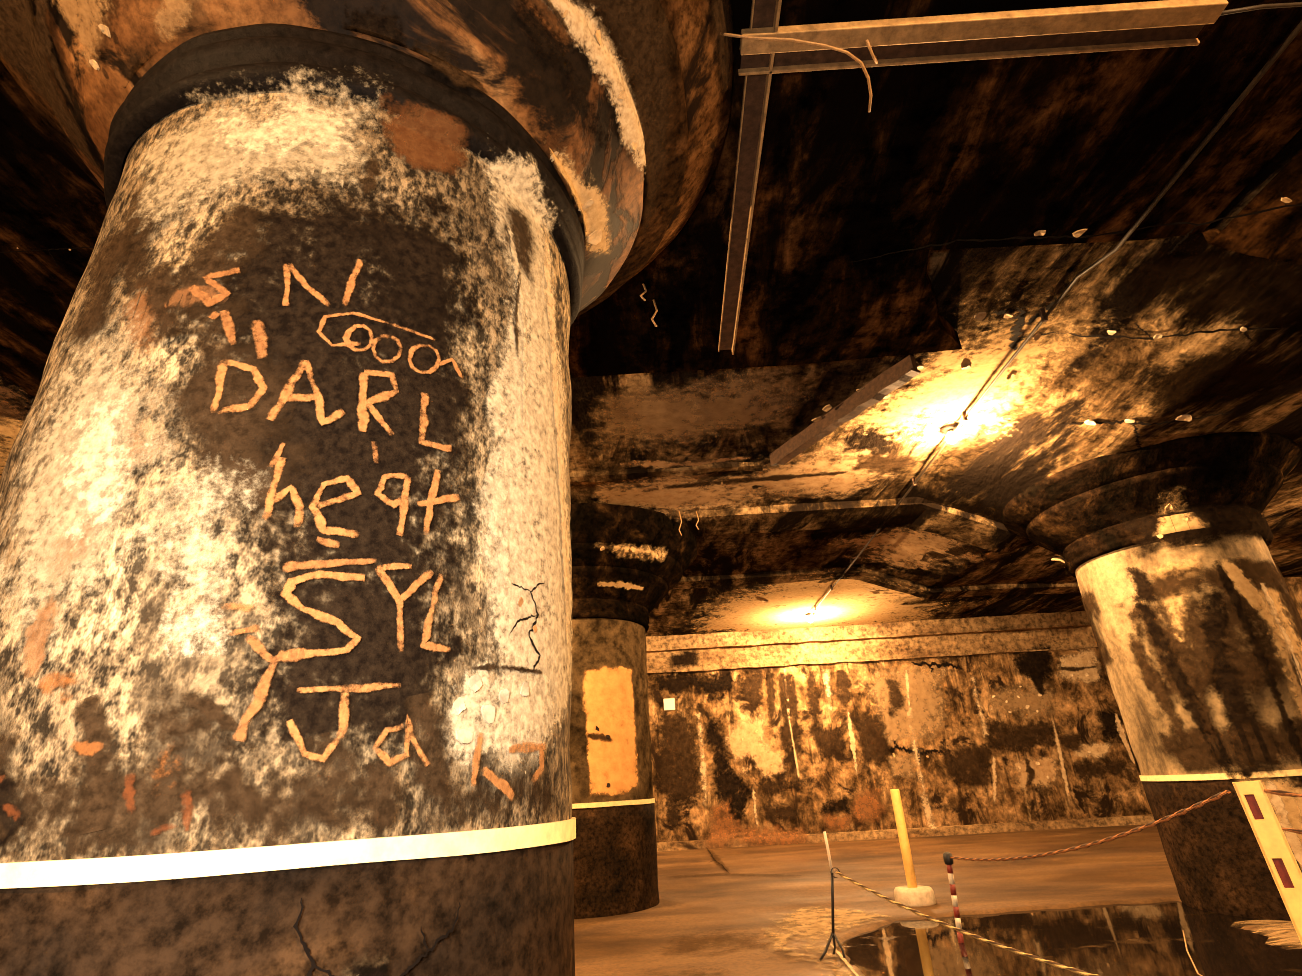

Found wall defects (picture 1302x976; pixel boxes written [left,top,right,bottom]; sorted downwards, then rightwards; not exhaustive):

leakage [0,72,573,860]
leakage [1081,592,1113,667]
leakage [666,794,680,827]
leakage [697,713,707,801]
leakage [737,669,857,778]
leakage [912,740,937,830]
leakage [1053,722,1069,795]
leakage [1115,714,1140,773]
leakage [1128,555,1302,870]